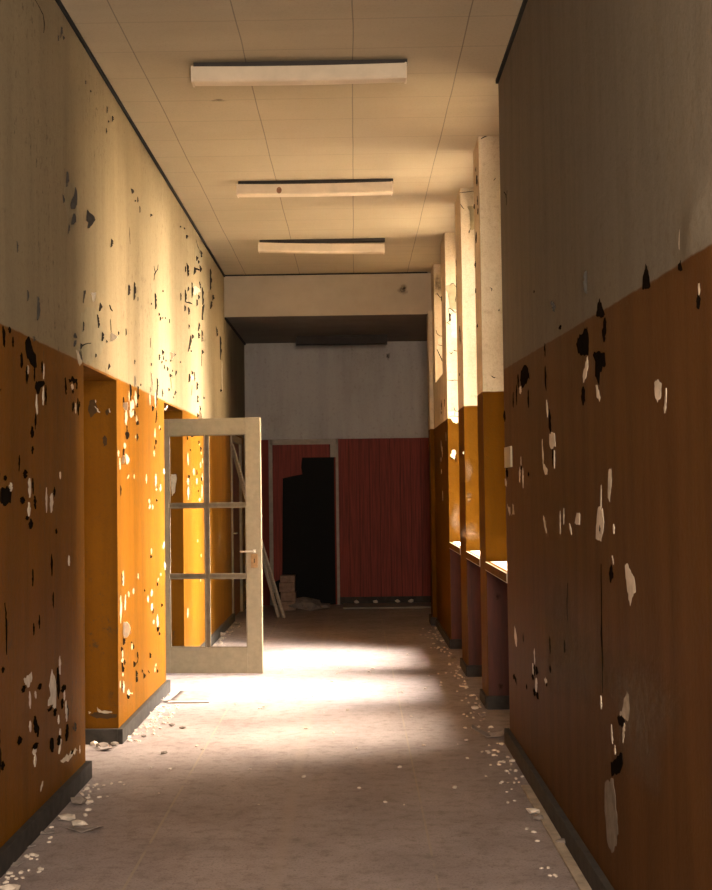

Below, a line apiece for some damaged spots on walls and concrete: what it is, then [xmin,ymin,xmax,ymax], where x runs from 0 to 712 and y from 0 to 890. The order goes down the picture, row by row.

peeling [73,290,127,366]
peeling [180,226,215,419]
peeling [441,277,457,312]
peeling [576,298,606,405]
peeling [117,350,181,496]
peeling [146,436,203,509]
peeling [542,400,556,475]
peeling [559,508,580,535]
flaking render [596,469,615,541]
peeling [120,562,166,635]
flaking render [625,563,636,605]
peeling [120,641,158,699]